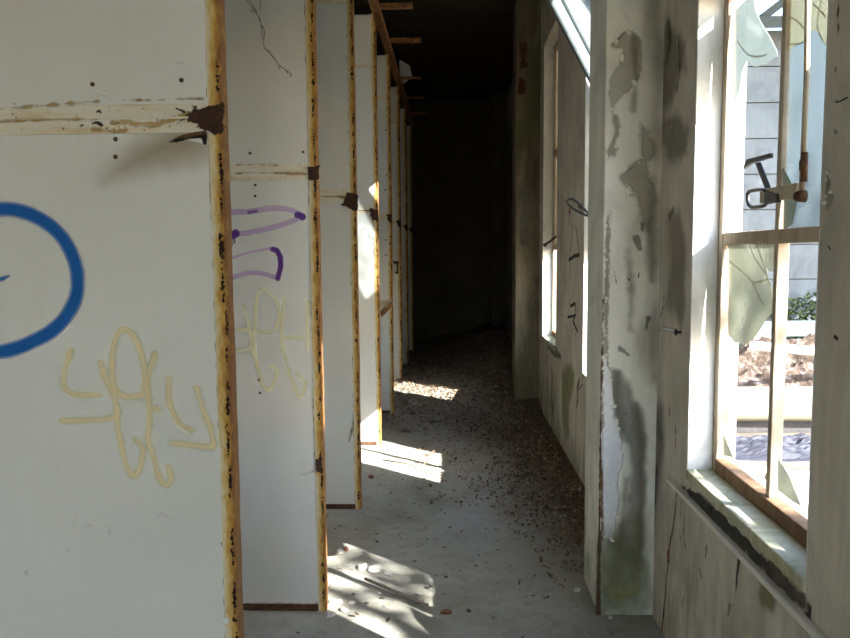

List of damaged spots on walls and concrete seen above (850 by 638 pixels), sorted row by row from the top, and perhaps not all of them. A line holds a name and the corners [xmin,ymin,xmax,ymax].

corrosion [111,98,226,135]
peeling [606,29,642,162]
peeling [621,132,654,228]
peeling [662,111,689,166]
corrosion [314,452,324,515]
peeling [601,353,625,542]
leakage [612,371,645,565]
crack [661,492,677,632]